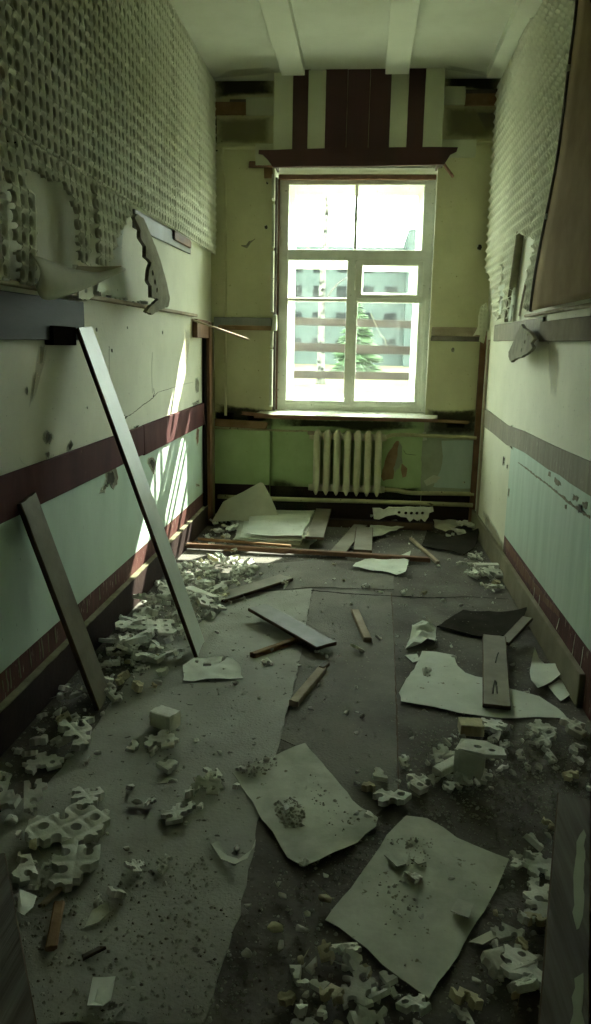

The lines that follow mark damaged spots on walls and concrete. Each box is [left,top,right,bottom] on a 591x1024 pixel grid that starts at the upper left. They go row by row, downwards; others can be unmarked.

peeling [381,441,407,488]